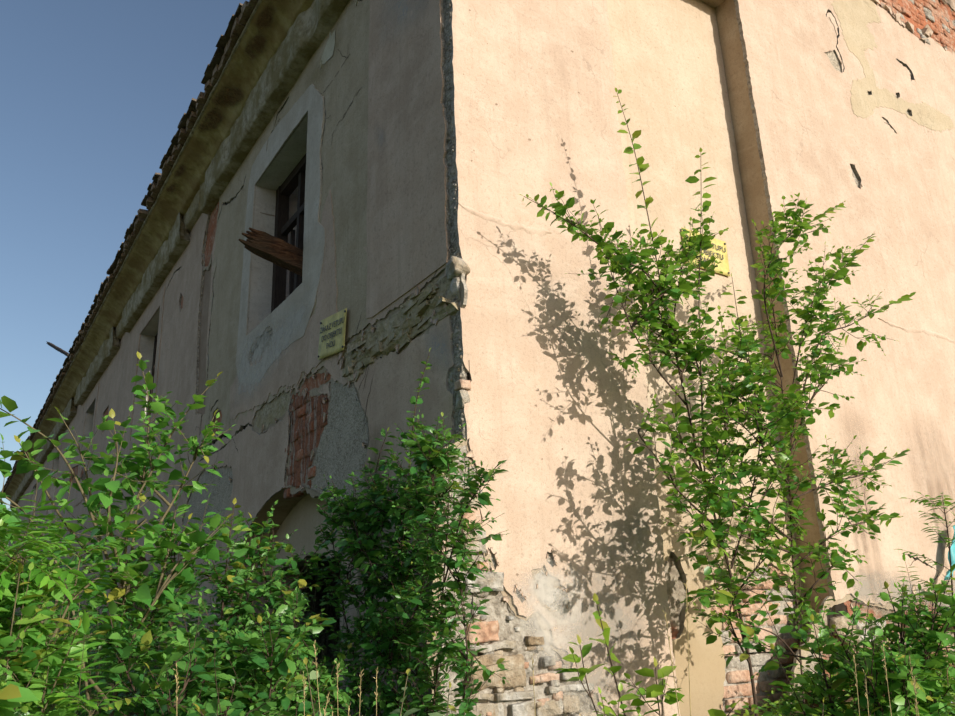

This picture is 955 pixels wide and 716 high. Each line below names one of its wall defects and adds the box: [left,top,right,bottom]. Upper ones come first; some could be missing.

peeling [831,0,955,133]
peeling [201,202,219,271]
flaking render [253,0,611,716]